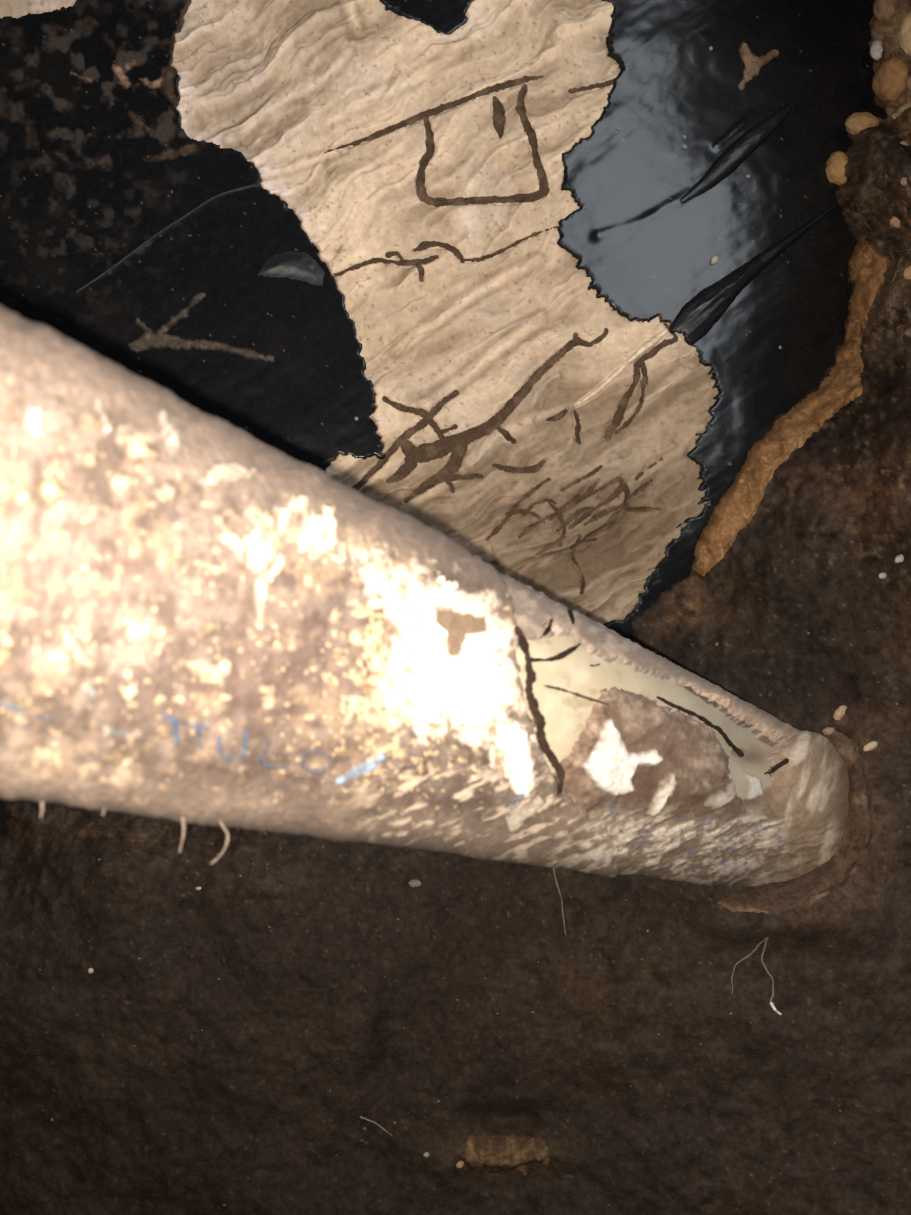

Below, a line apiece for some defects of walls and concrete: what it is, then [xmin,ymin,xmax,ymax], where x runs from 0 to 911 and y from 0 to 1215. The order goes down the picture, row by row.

crack [351,323,678,796]
peeling [584,720,663,796]
peeling [647,774,678,817]
crack [656,696,789,775]
peeling [705,773,763,811]